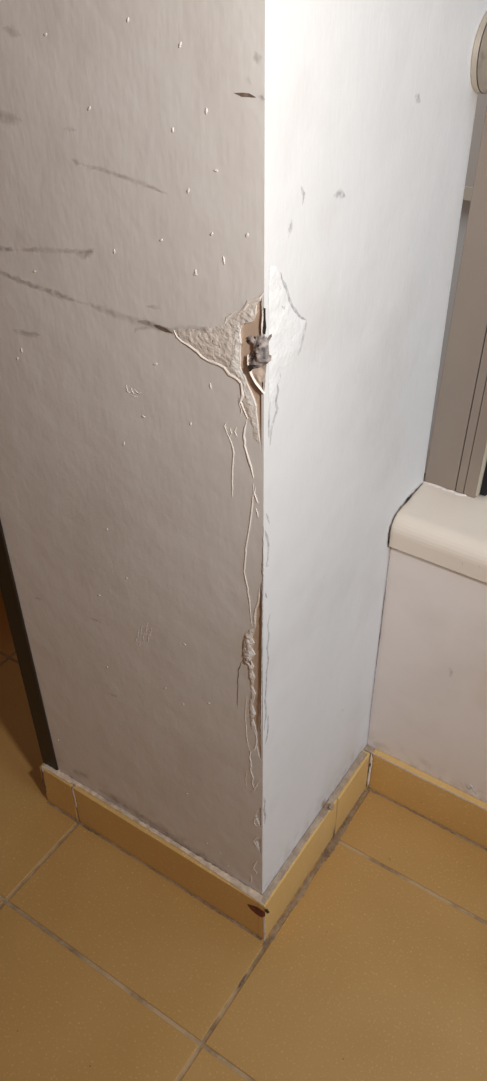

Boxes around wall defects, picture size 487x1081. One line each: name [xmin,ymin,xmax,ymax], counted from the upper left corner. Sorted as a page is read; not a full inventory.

spalling [154,265,307,478]
crack [224,423,270,744]